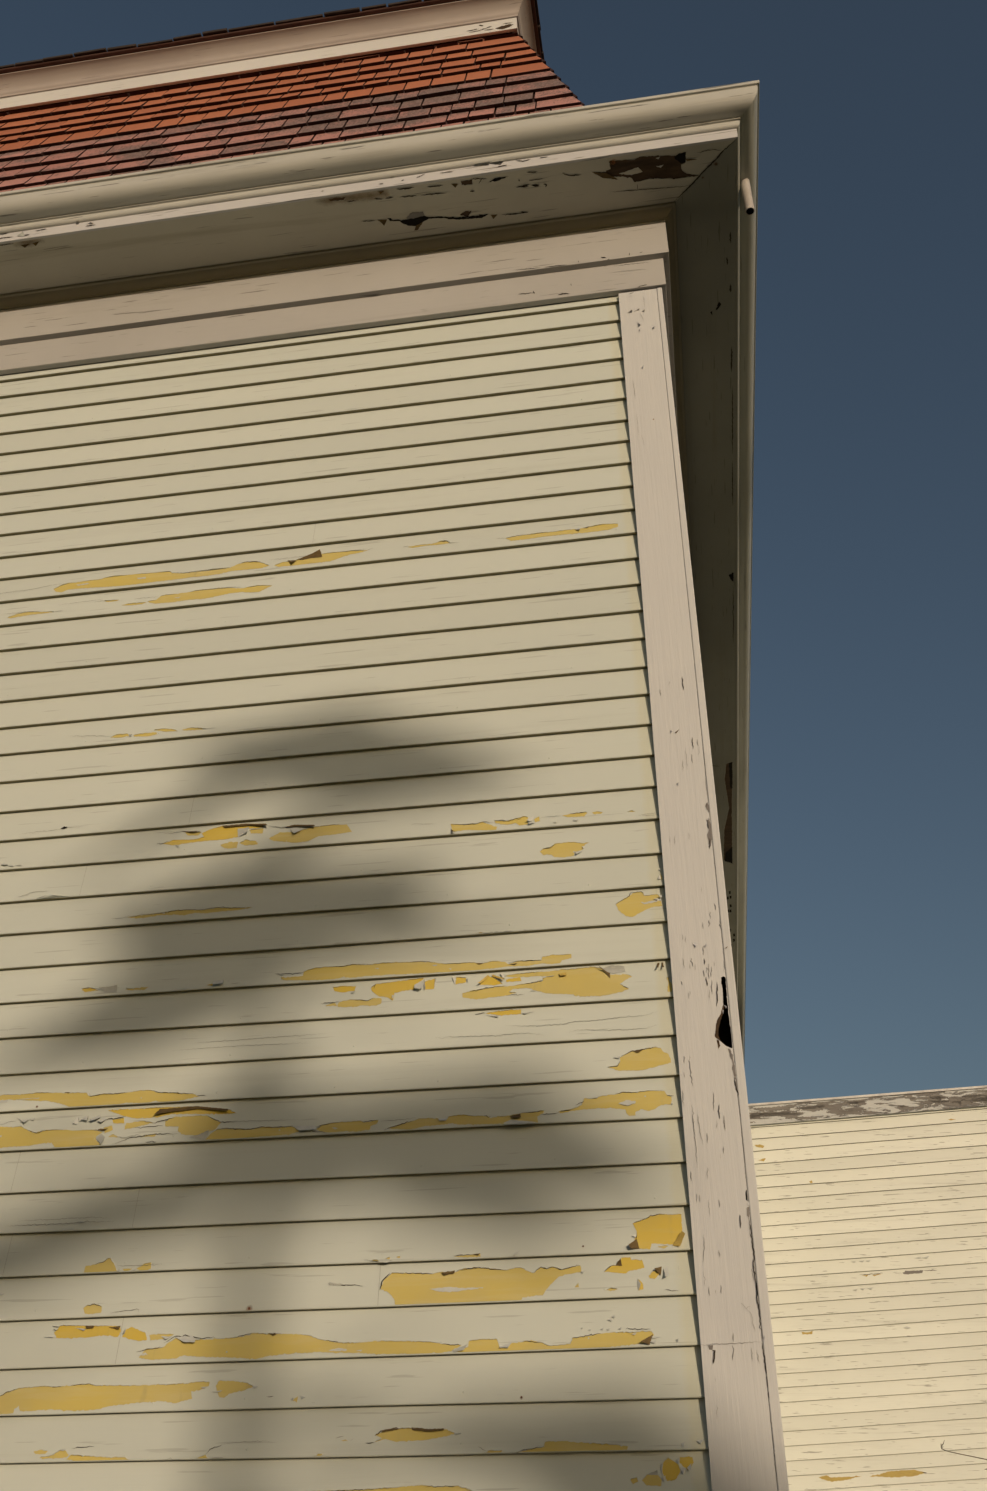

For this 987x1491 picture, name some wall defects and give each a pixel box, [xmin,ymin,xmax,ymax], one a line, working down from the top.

peeling [1,549,368,618]
peeling [157,823,352,849]
peeling [276,954,632,1017]
peeling [608,1046,671,1071]
peeling [0,1090,673,1148]
peeling [749,1090,987,1123]
peeling [604,1213,685,1292]
peeling [369,1253,584,1305]
peeling [47,1304,658,1360]
peeling [0,1380,305,1414]
peeling [371,1427,461,1443]
peeling [819,1470,926,1482]